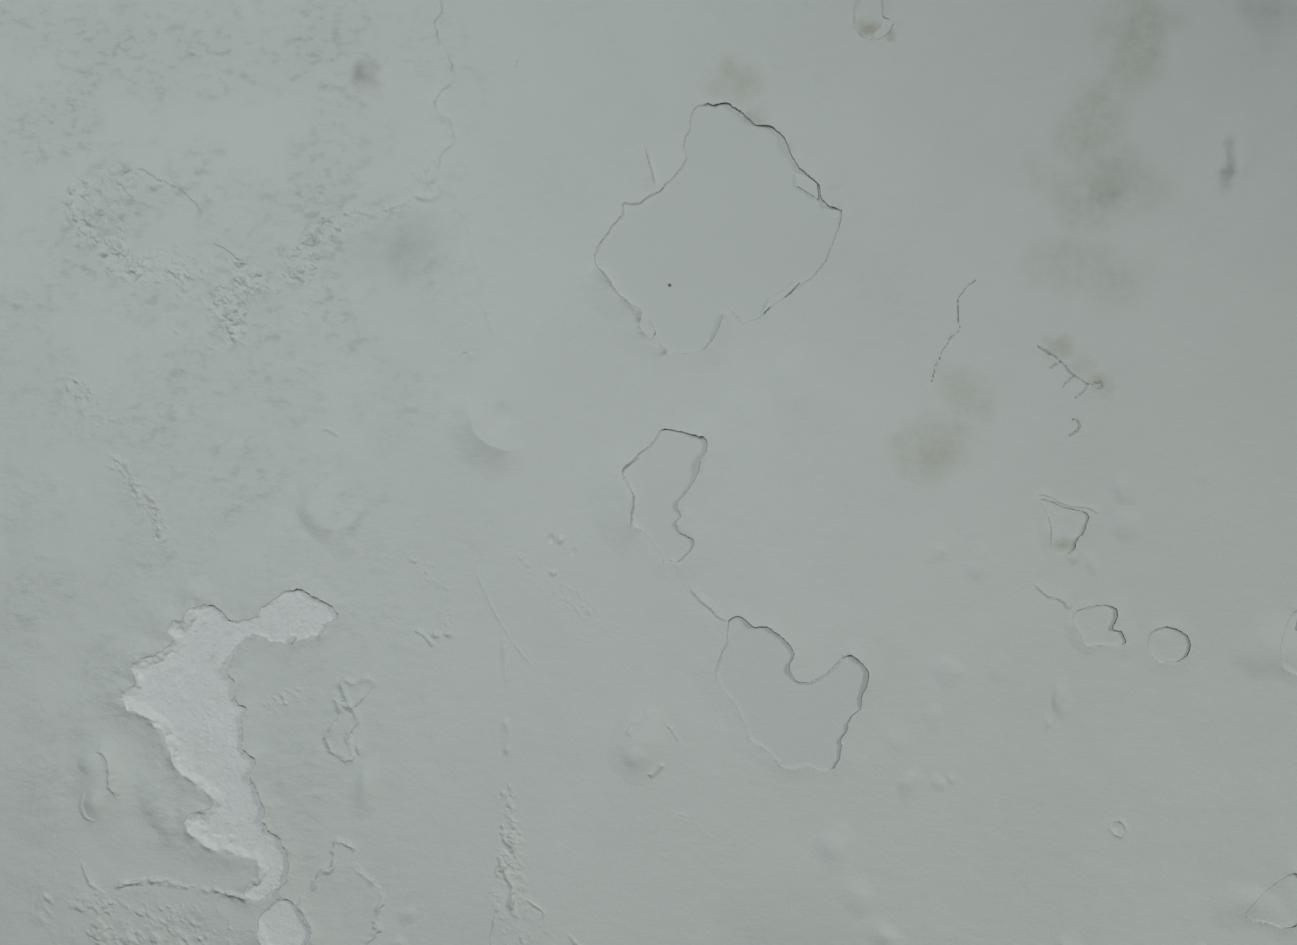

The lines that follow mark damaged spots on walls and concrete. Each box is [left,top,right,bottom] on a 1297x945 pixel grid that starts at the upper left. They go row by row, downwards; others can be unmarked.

peeling [851,0,900,47]
peeling [576,72,865,374]
crack [931,280,976,382]
crack [1037,346,1104,437]
peeling [96,571,356,945]